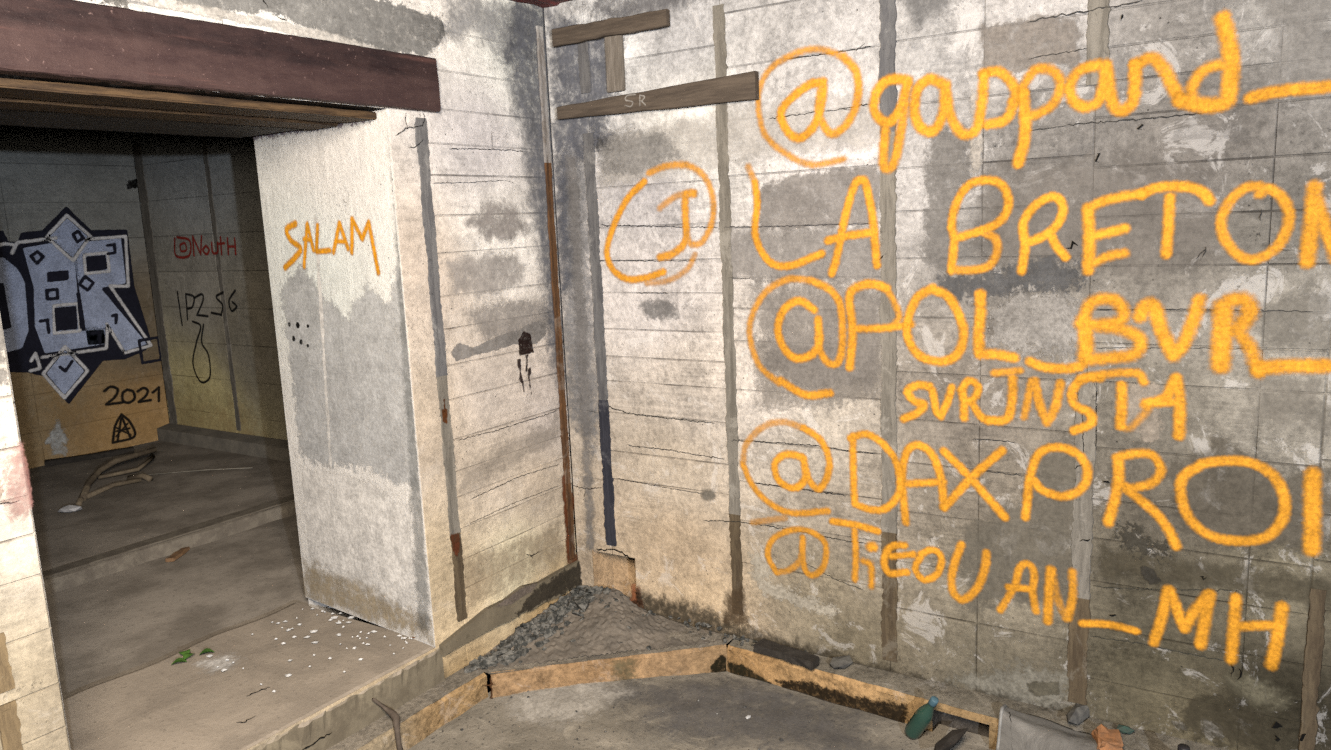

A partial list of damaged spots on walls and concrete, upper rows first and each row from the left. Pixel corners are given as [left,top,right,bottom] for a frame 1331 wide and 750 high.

leakage [440,0,882,549]
leakage [515,561,582,617]